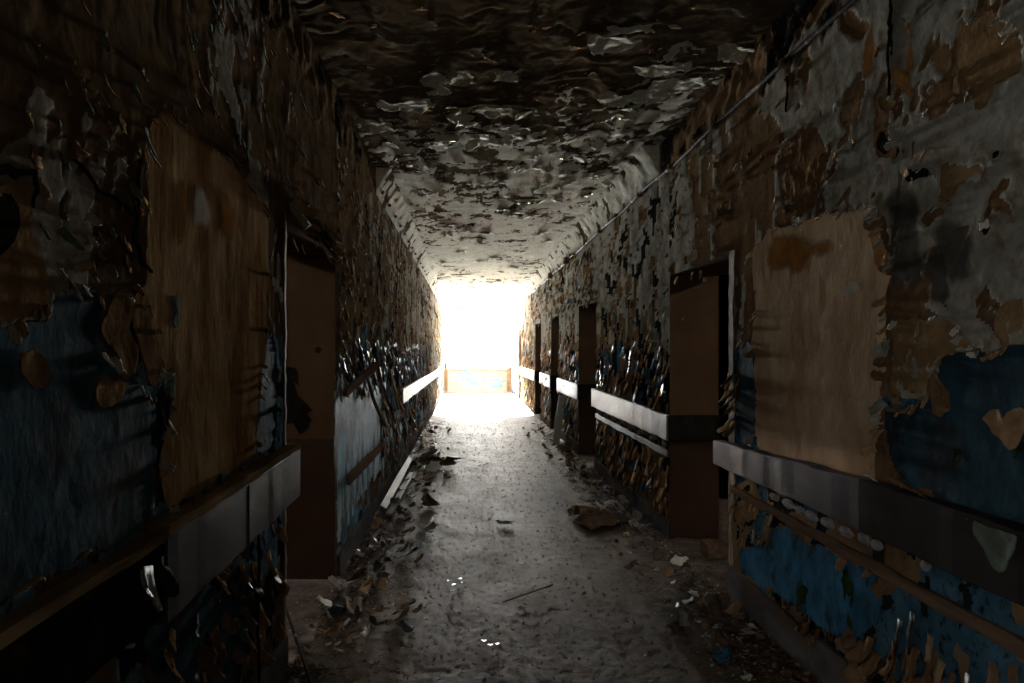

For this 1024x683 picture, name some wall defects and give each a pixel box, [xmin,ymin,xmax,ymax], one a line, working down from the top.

peeling [355,19,706,220]
peeling [717,43,755,65]
peeling [833,71,865,145]
peeling [922,14,1023,121]
peeling [0,0,312,607]
peeling [286,91,524,547]
peeling [520,122,1024,524]
peeling [141,523,291,683]
peeling [728,486,1018,683]